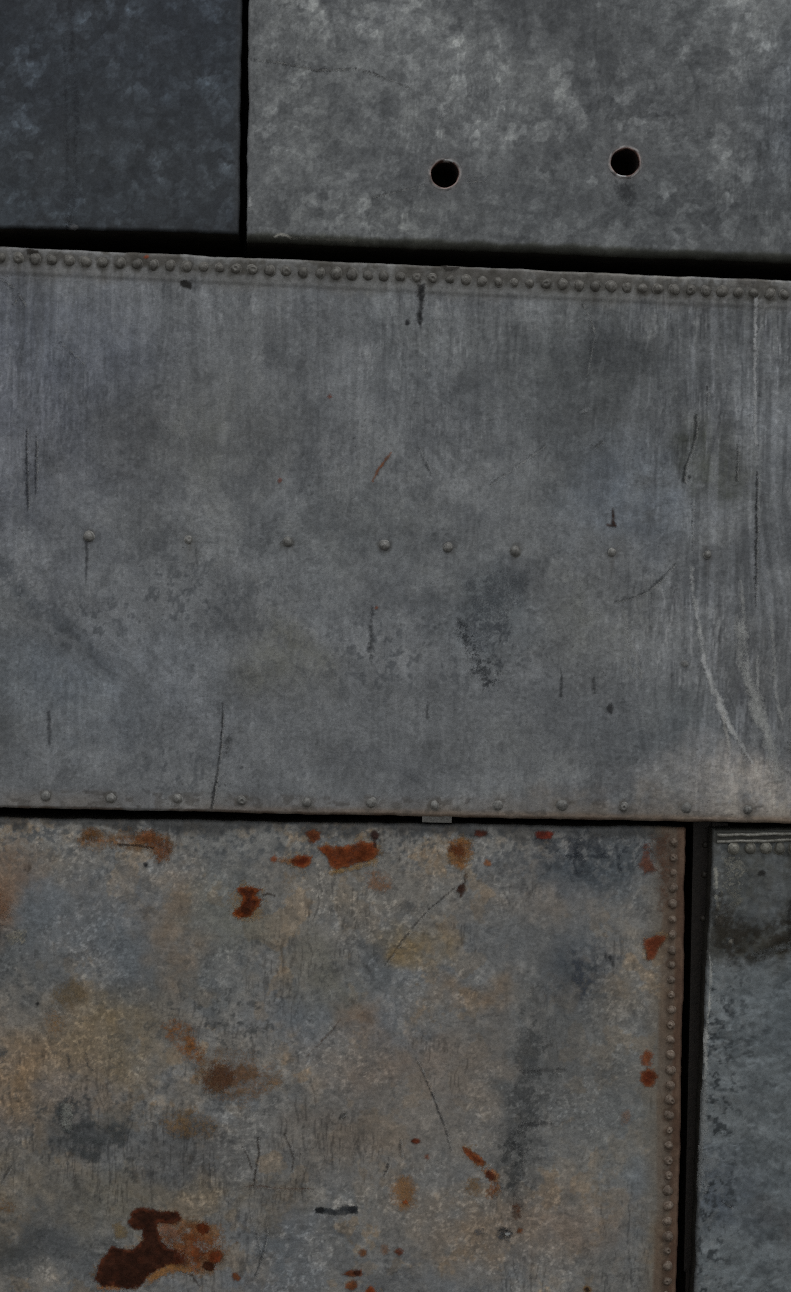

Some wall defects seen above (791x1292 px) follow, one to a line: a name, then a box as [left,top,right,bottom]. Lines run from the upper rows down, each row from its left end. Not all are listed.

rust [77,828,173,862]
rust [271,830,391,891]
rust [233,884,275,918]
rust [643,932,665,960]
rust [639,1051,658,1087]
rust [463,1146,501,1196]
rust [92,1207,225,1290]
rust [344,1245,403,1292]